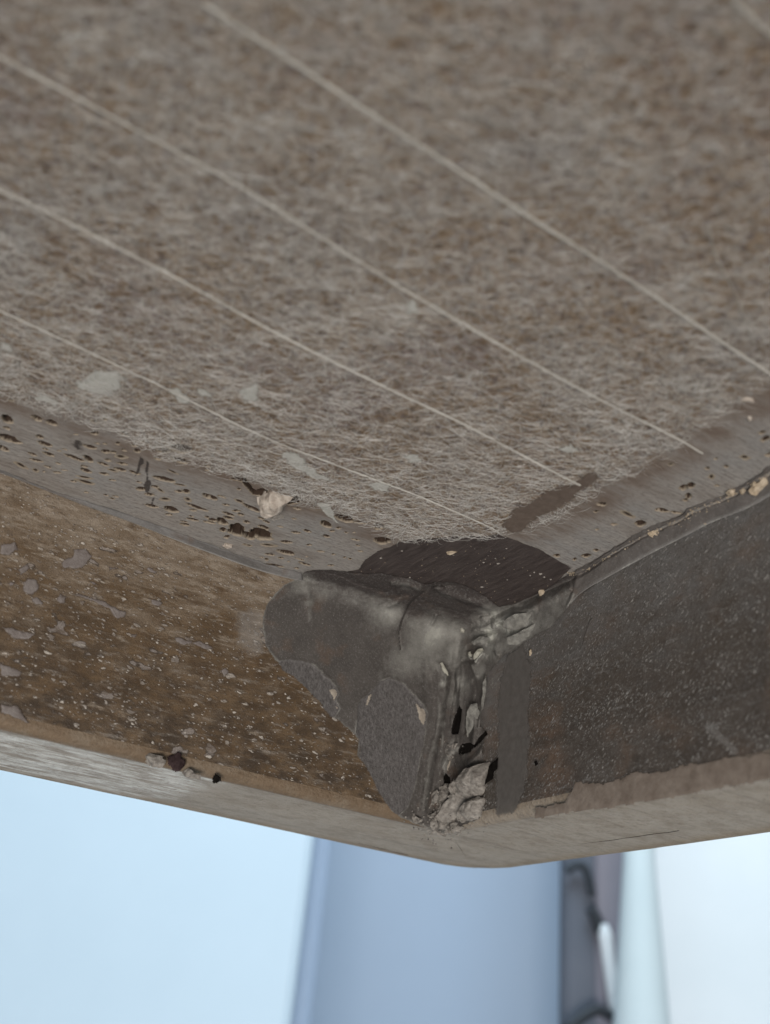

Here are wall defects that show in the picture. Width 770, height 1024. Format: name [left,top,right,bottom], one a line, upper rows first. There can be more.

spalling [0,414,391,568]
damp [348,472,598,607]
spalling [145,752,221,784]